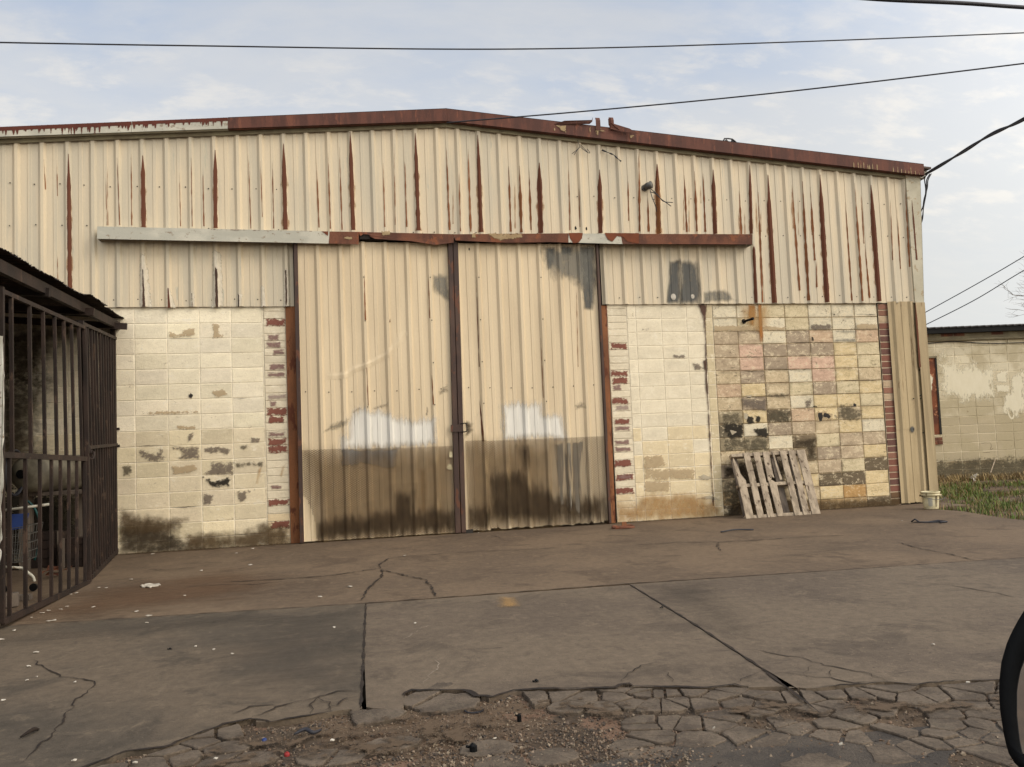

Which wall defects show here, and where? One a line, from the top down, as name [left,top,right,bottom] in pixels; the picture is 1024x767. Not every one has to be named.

corrosion [0,117,228,135]
corrosion [249,144,289,231]
peeling [150,411,198,429]
peeling [267,394,288,453]
peeling [172,465,197,474]
peeling [269,486,290,506]
water stain [121,512,371,555]
peeling [270,521,290,529]
crack [21,660,96,763]